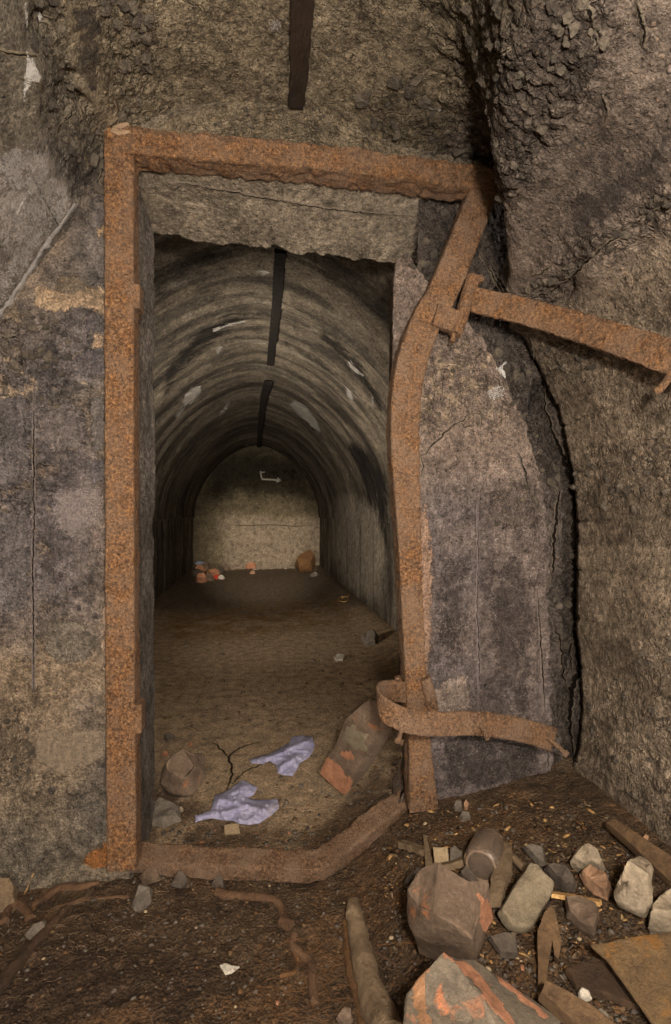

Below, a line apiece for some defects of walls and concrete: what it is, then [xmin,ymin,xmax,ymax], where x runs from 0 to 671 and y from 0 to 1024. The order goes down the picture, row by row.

crack [420,406,483,477]
crack [517,337,582,770]
crack [212,742,264,790]